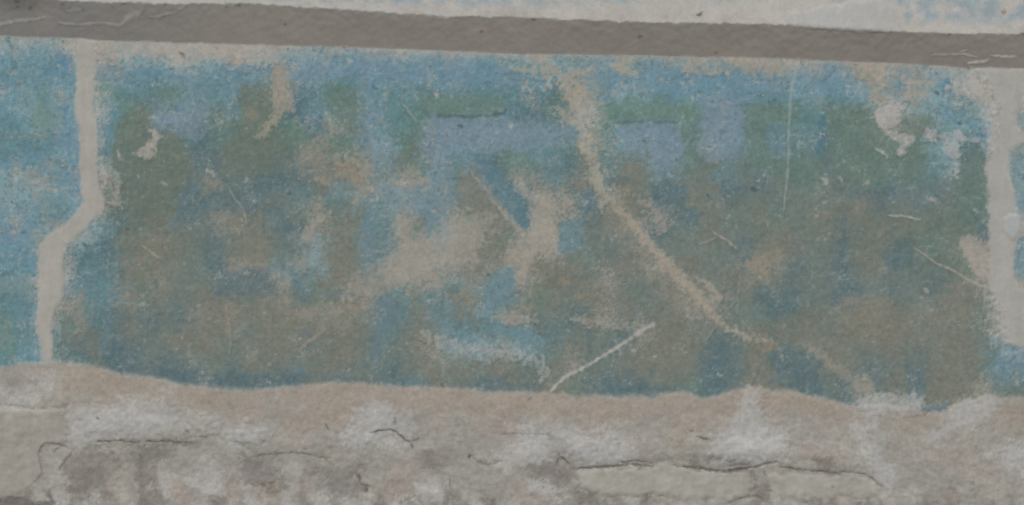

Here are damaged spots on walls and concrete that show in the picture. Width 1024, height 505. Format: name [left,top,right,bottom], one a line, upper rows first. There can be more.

spalling [0,444,124,505]
crack [34,438,194,505]
crack [233,422,335,487]
crack [370,416,420,449]
spalling [404,447,451,472]
crack [447,448,503,488]
crack [696,434,712,442]
crack [554,452,884,505]